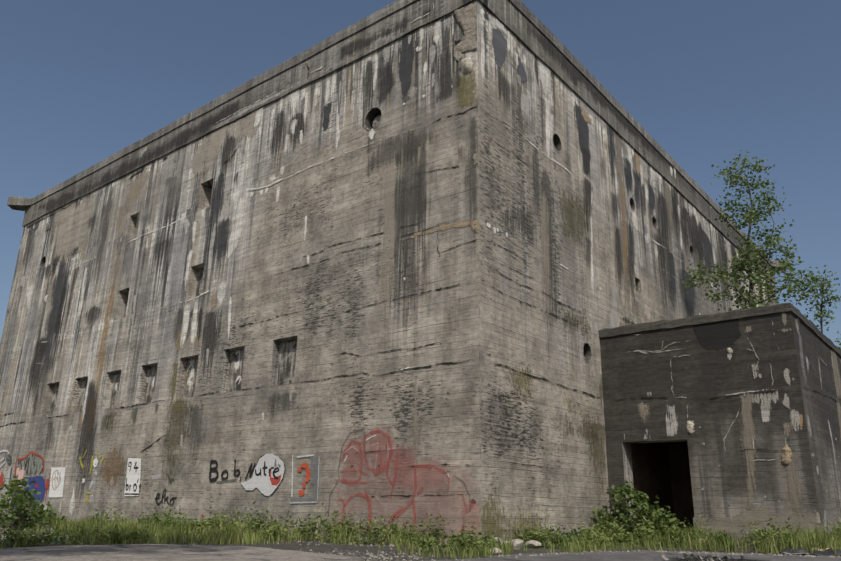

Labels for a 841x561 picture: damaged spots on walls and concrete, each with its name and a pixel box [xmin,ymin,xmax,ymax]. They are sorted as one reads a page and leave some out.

damp [28,7,774,454]
rust [96,244,120,395]
crack [300,334,691,419]
crack [709,323,795,461]